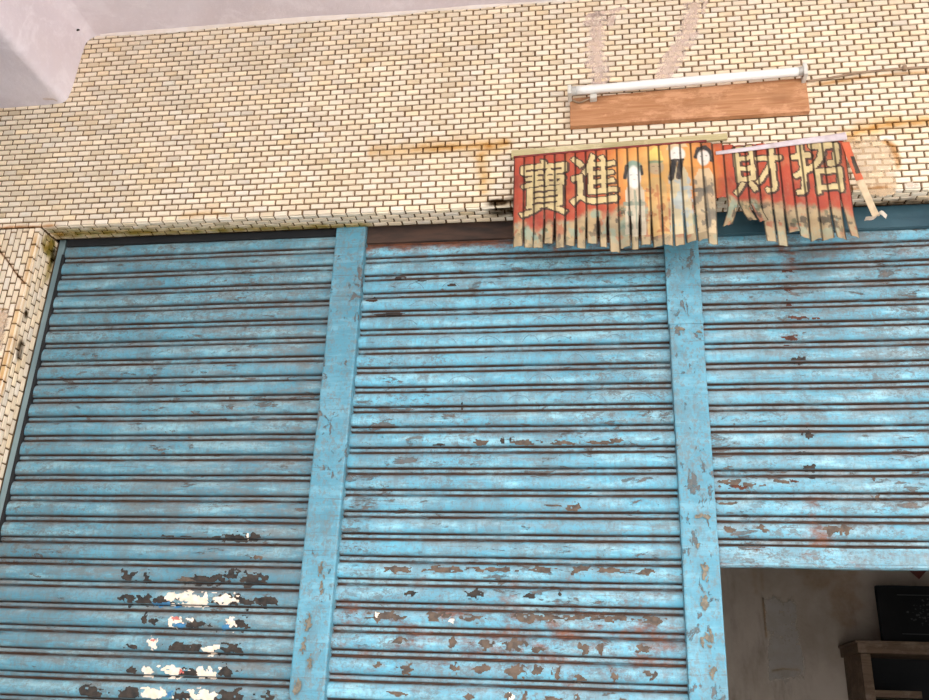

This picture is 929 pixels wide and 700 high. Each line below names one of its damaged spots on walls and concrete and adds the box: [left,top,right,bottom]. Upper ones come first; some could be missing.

rust [784,286,820,323]
rust [795,451,823,479]
peeling [207,531,261,543]
peeling [76,568,278,700]